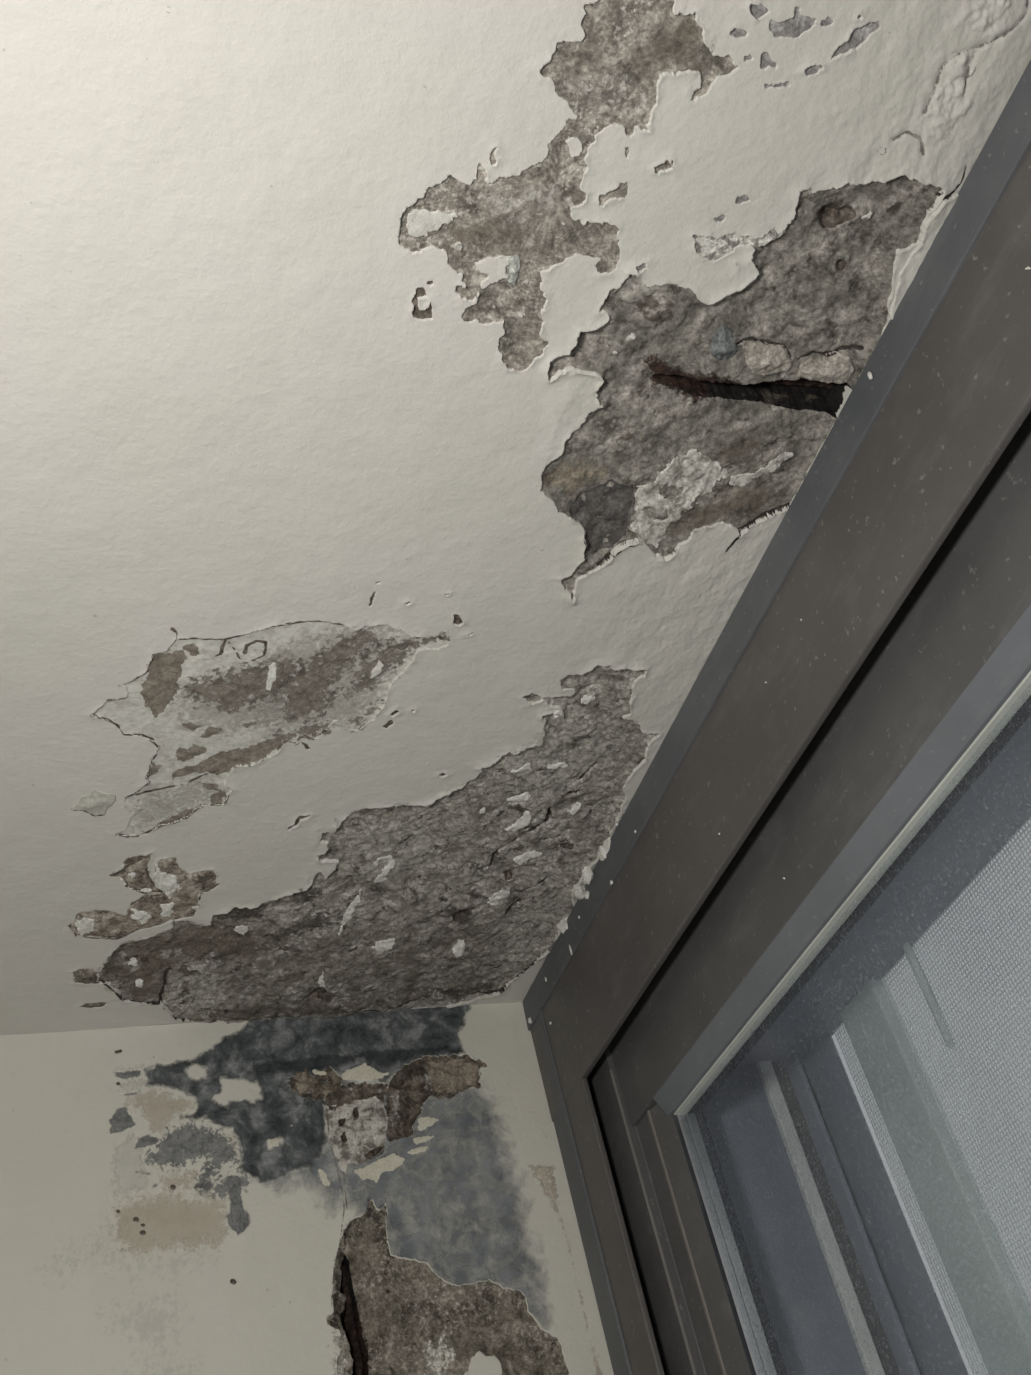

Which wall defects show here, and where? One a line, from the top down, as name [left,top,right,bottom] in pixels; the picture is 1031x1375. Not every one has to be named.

flaking render [398,0,966,598]
peeling [71,614,472,838]
flaking render [73,665,657,1024]
damp [109,1005,546,1317]
peeling [287,1054,487,1186]
flaking render [326,1199,569,1375]
damp [530,1165,559,1212]